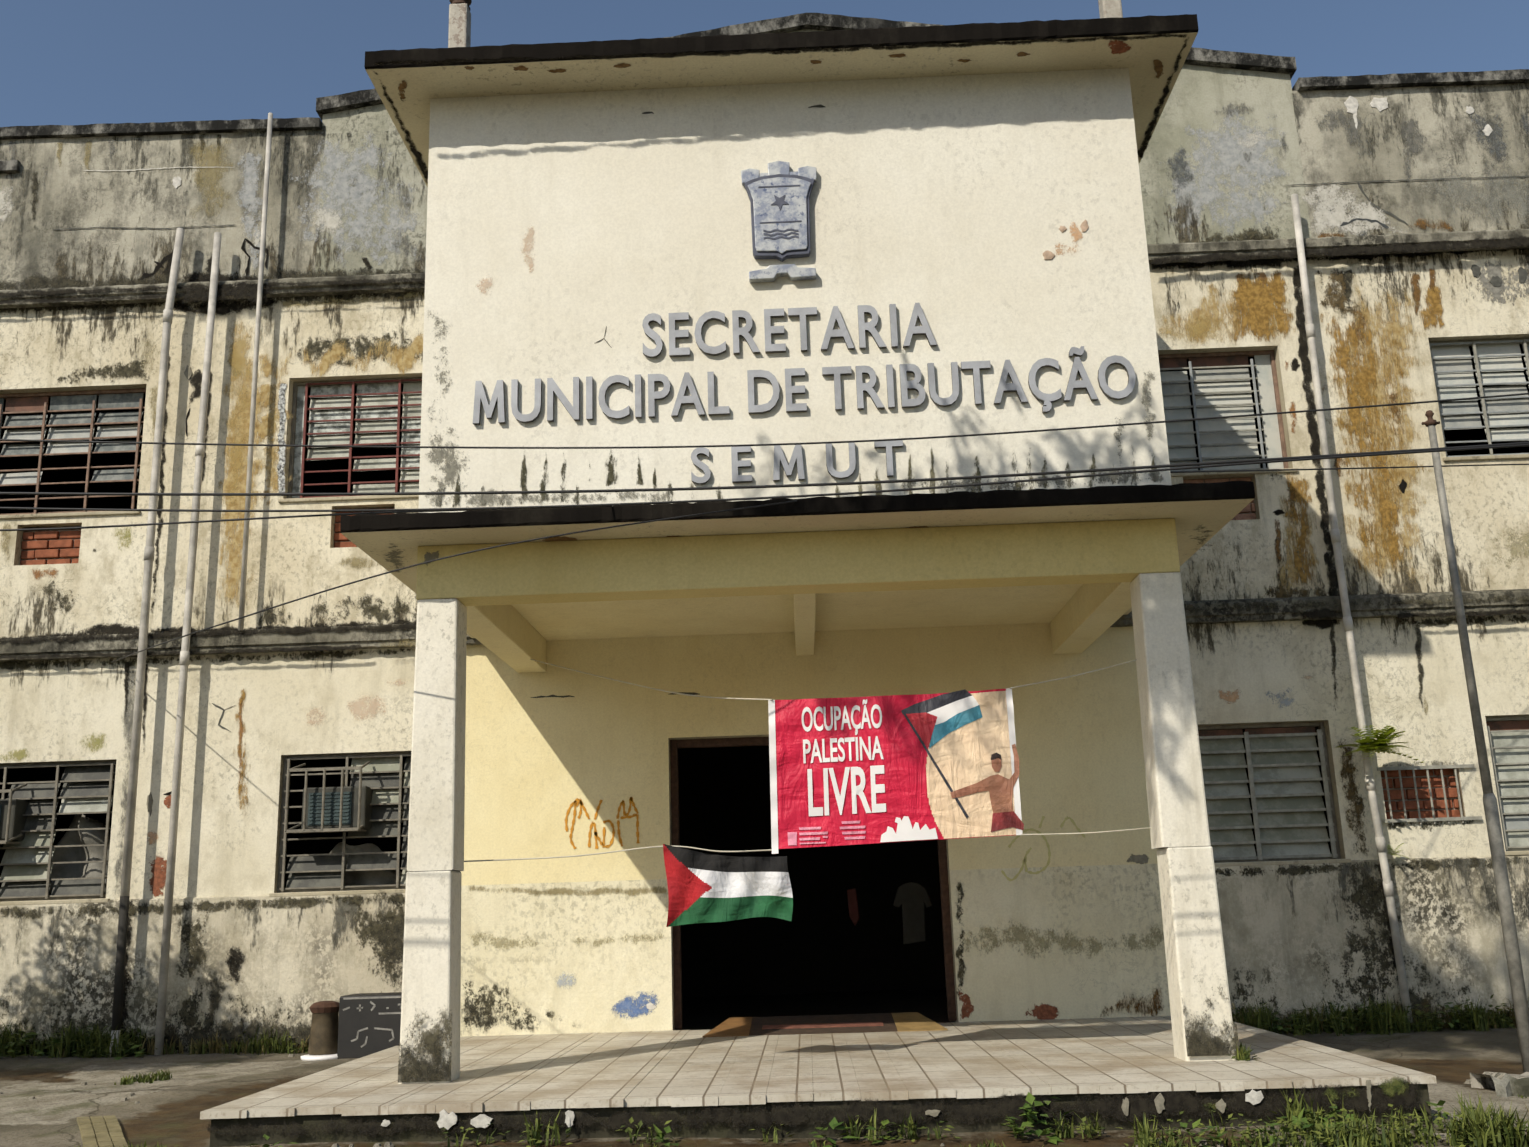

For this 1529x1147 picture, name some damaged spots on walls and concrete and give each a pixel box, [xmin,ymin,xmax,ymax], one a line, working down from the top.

peeling [1043,219,1088,260]
damp [1150,83,1529,713]
damp [0,33,1189,884]
corrosion [235,689,248,809]
flaking render [147,791,172,897]
damp [471,933,536,950]
damp [470,887,667,896]
damp [956,882,1164,995]
damp [1215,739,1529,1025]
mould [398,982,554,1083]